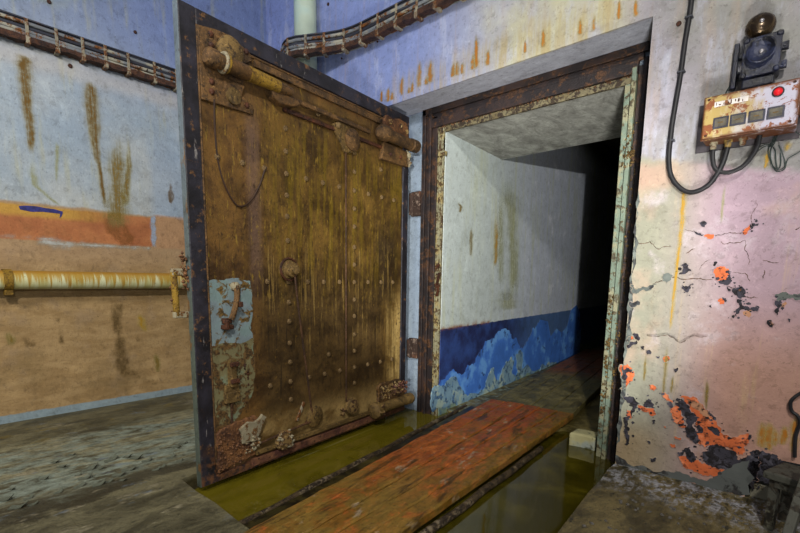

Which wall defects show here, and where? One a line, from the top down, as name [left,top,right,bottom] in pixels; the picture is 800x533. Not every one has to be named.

corrosion [18,56,35,147]
corrosion [85,84,105,202]
corrosion [380,64,433,102]
corrosion [451,40,489,77]
corrosion [621,122,639,218]
crack [638,208,779,299]
corrosion [598,261,627,431]
crack [647,332,708,343]
peeling [615,191,784,496]
peeling [765,291,800,329]